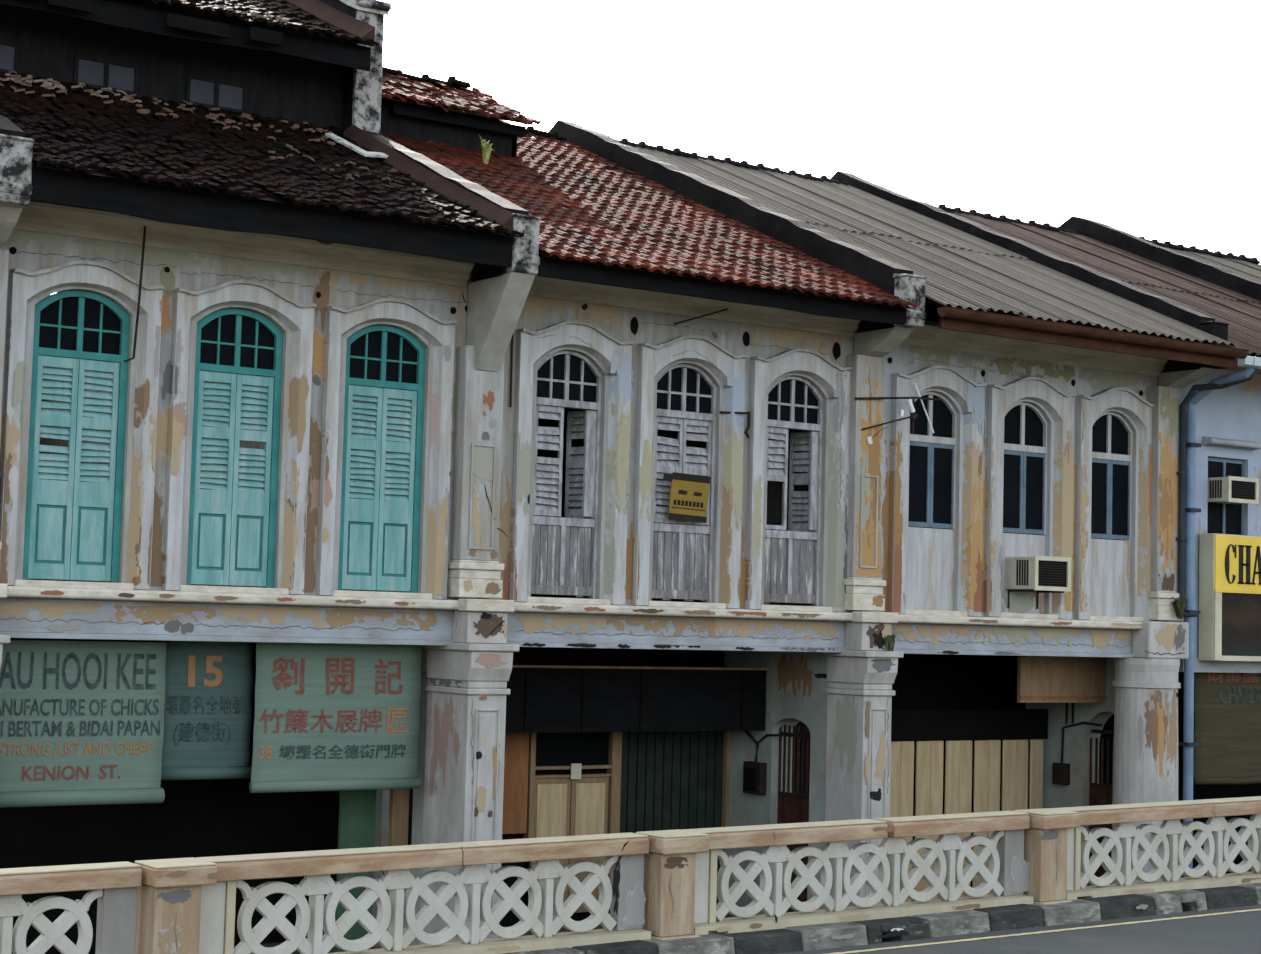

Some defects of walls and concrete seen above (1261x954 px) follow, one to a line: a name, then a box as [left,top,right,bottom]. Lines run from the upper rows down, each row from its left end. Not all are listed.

peeling [133,326,185,474]
peeling [288,375,333,513]